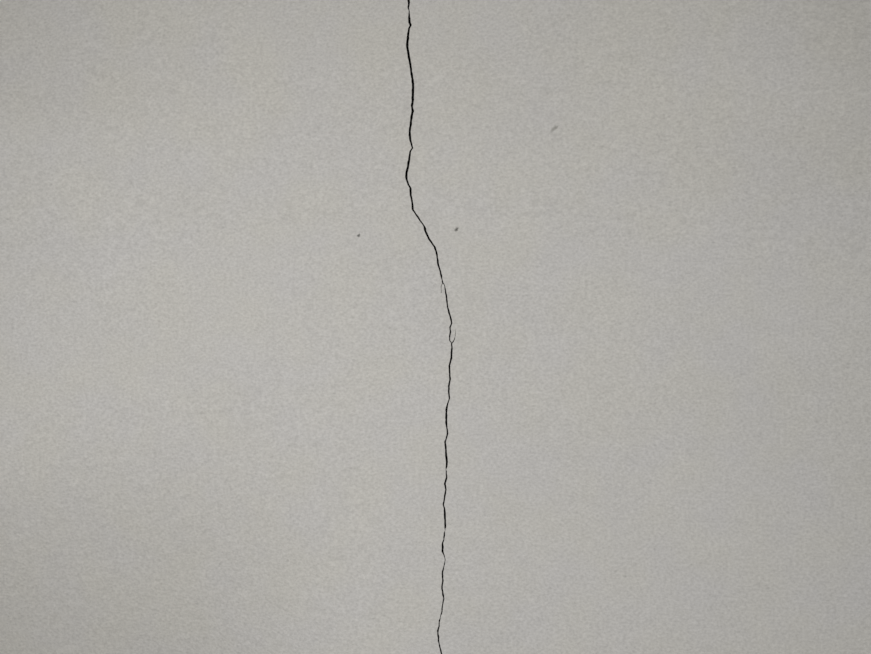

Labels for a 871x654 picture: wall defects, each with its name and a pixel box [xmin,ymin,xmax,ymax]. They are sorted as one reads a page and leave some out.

crack [405,0,456,654]